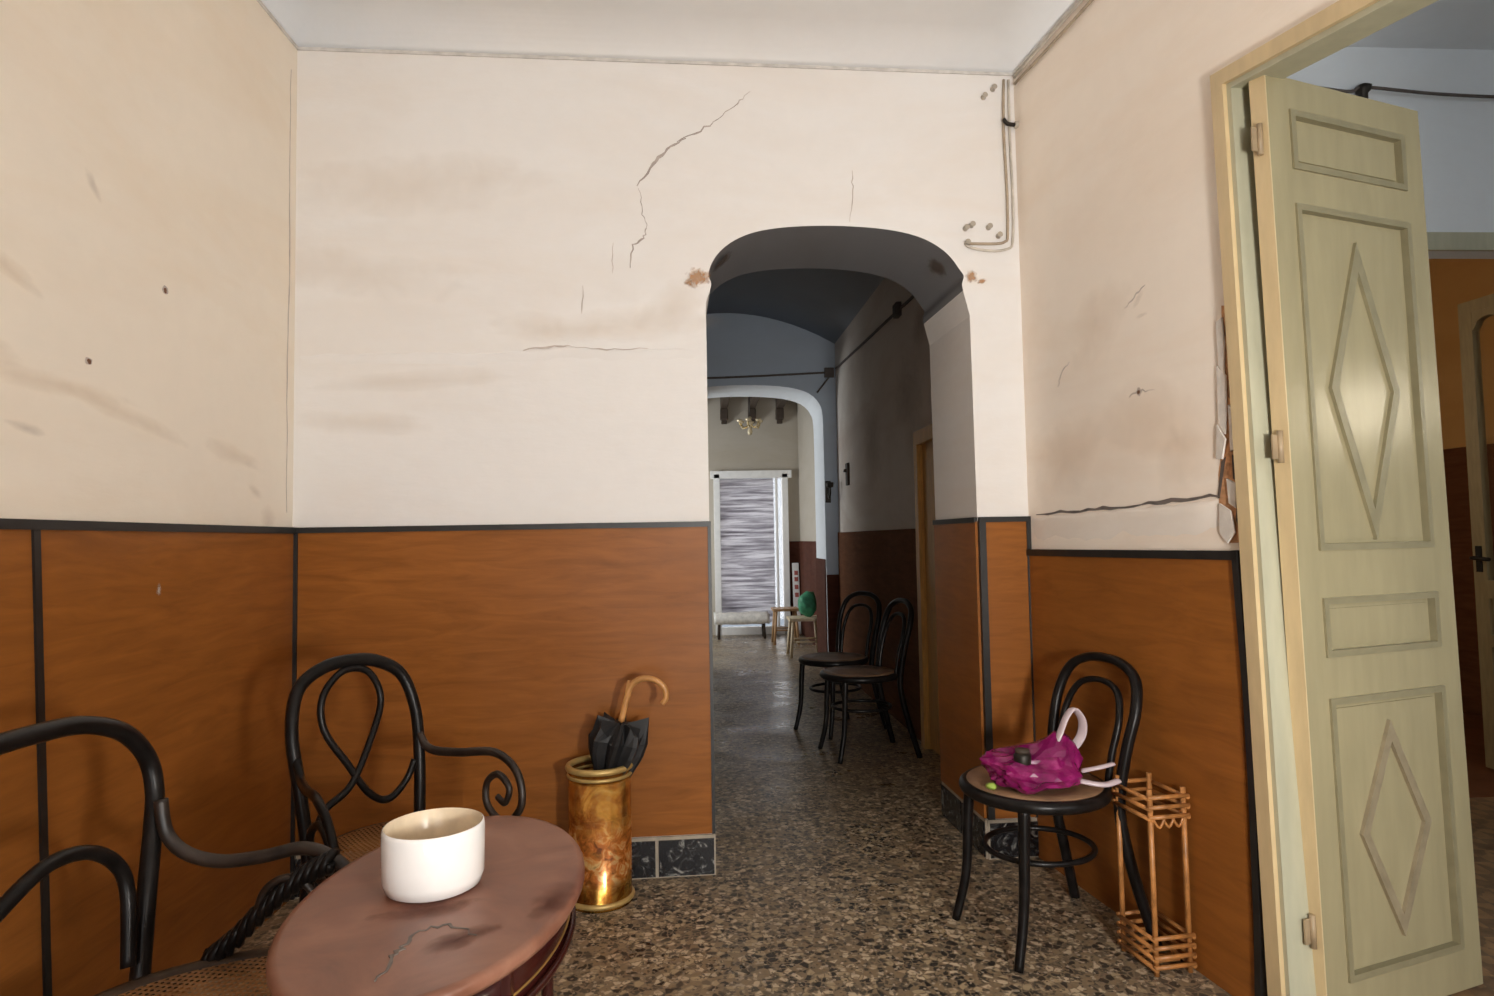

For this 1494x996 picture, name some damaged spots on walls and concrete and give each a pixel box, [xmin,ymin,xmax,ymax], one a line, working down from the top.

crack [523,92,749,351]
crack [1036,494,1218,515]
peeling [1215,306,1239,543]